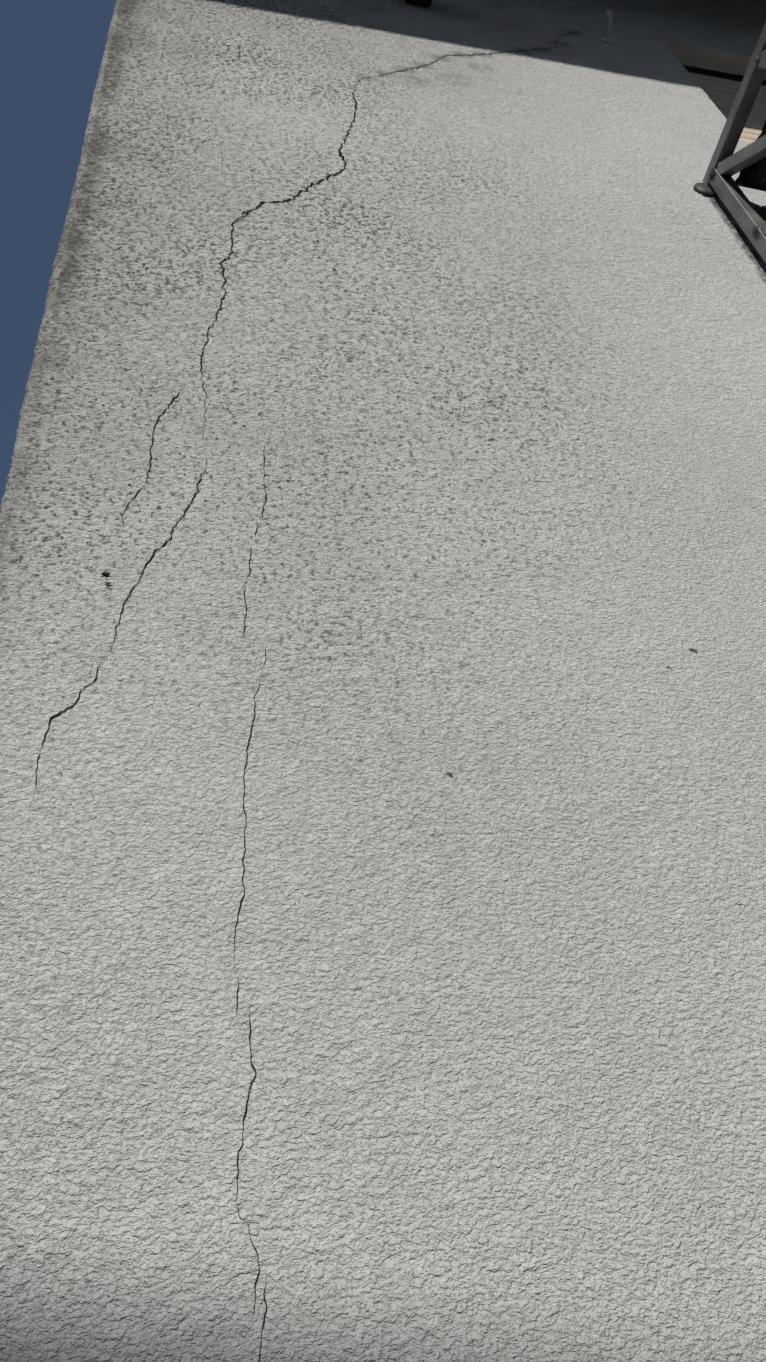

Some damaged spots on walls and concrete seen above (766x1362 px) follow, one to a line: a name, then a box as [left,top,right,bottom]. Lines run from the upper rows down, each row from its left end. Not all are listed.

crack [35,30,581,787]
crack [228,445,267,1362]